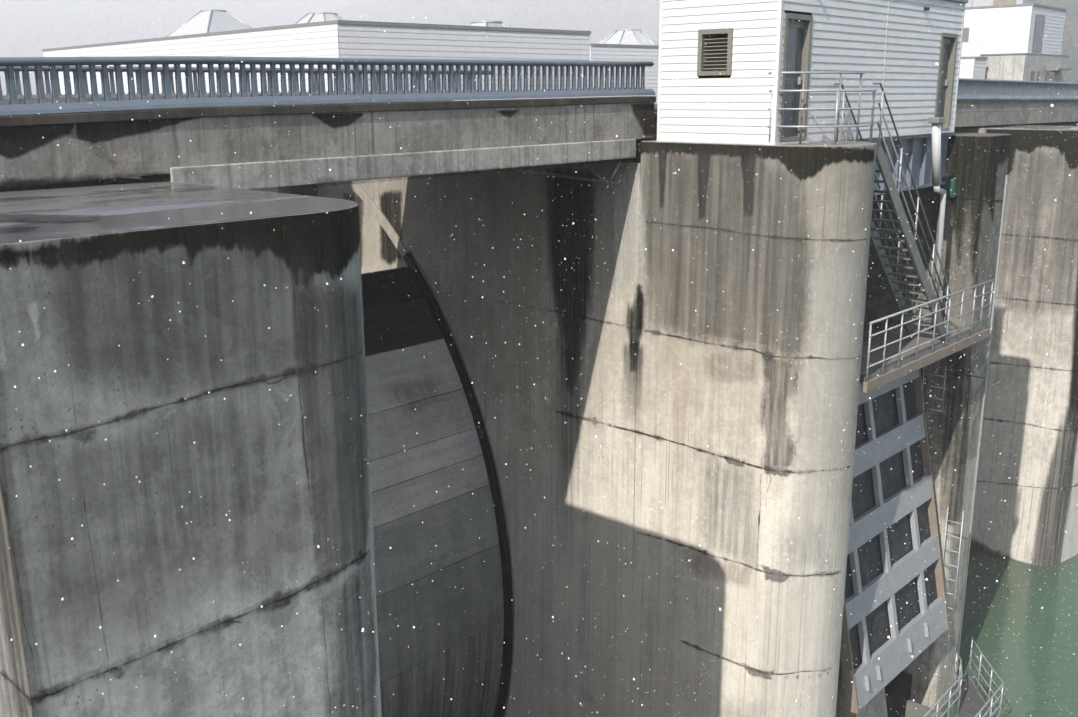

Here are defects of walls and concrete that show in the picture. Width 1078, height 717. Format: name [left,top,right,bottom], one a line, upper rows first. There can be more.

water stain [1007,139,1019,175]
water stain [1059,144,1078,169]
water stain [547,169,594,436]
water stain [615,149,805,469]
crack [0,358,349,477]
crack [552,410,850,481]
water stain [1031,275,1078,567]
crack [225,552,367,624]
crack [649,535,839,582]
water stain [970,539,1011,559]
crack [1,673,67,704]
crack [684,642,812,679]